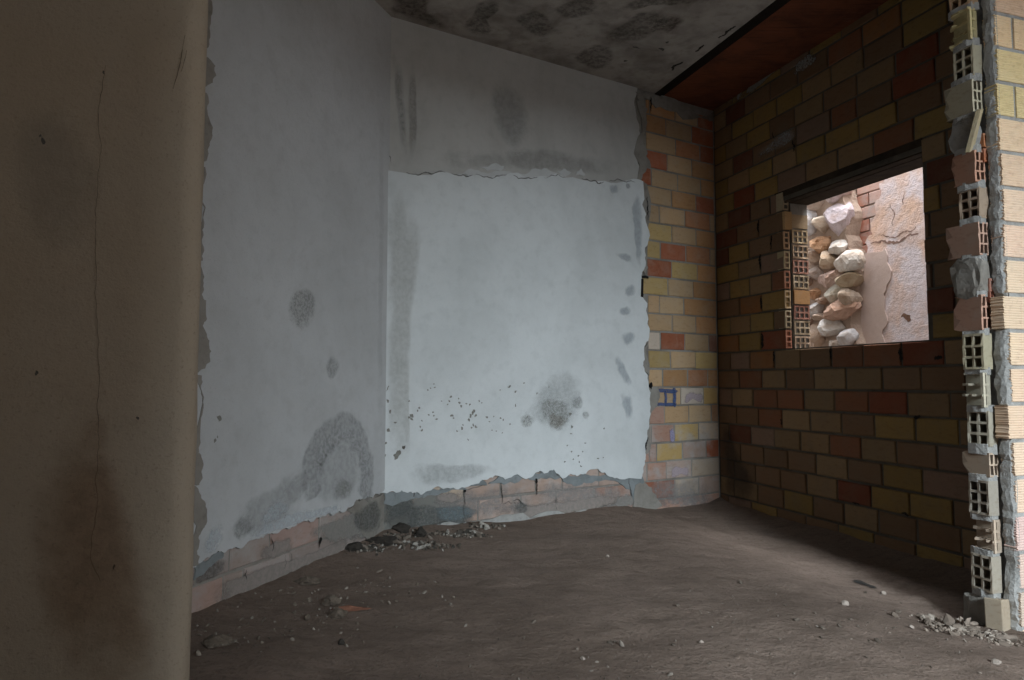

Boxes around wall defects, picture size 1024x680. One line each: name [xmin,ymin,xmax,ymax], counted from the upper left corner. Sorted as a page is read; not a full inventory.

flaking render [203,0,216,184]
flaking render [634,92,714,227]
flaking render [193,203,224,581]
flaking render [643,343,660,454]
flaking render [222,413,705,600]